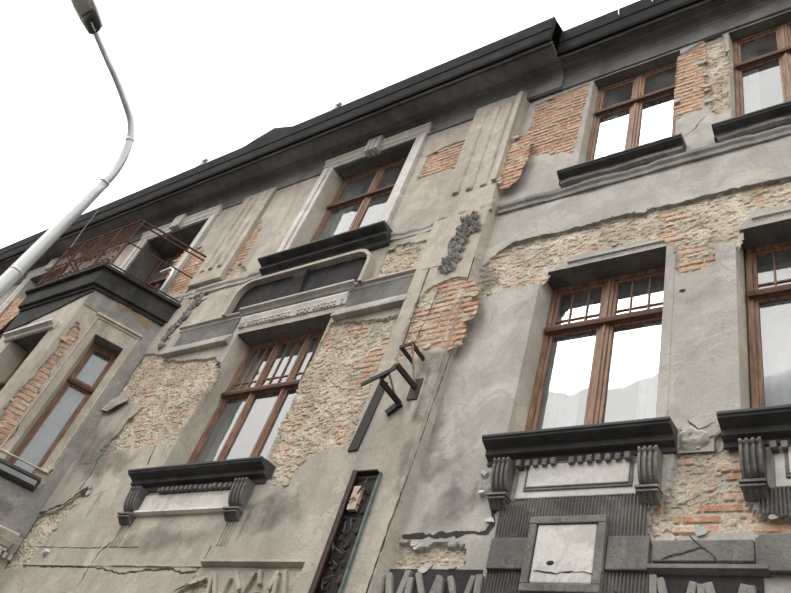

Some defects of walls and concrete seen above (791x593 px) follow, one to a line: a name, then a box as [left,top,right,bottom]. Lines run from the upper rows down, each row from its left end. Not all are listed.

flaking render [672,36,734,121]
flaking render [418,142,464,180]
flaking render [495,85,589,190]
spalling [397,180,791,362]
flaking render [0,323,79,445]
spalling [101,355,223,455]
spalling [272,319,396,487]
spalling [4,488,92,569]
crack [39,419,129,514]
crack [29,527,211,591]
spalling [185,576,207,593]
spalling [650,438,791,545]